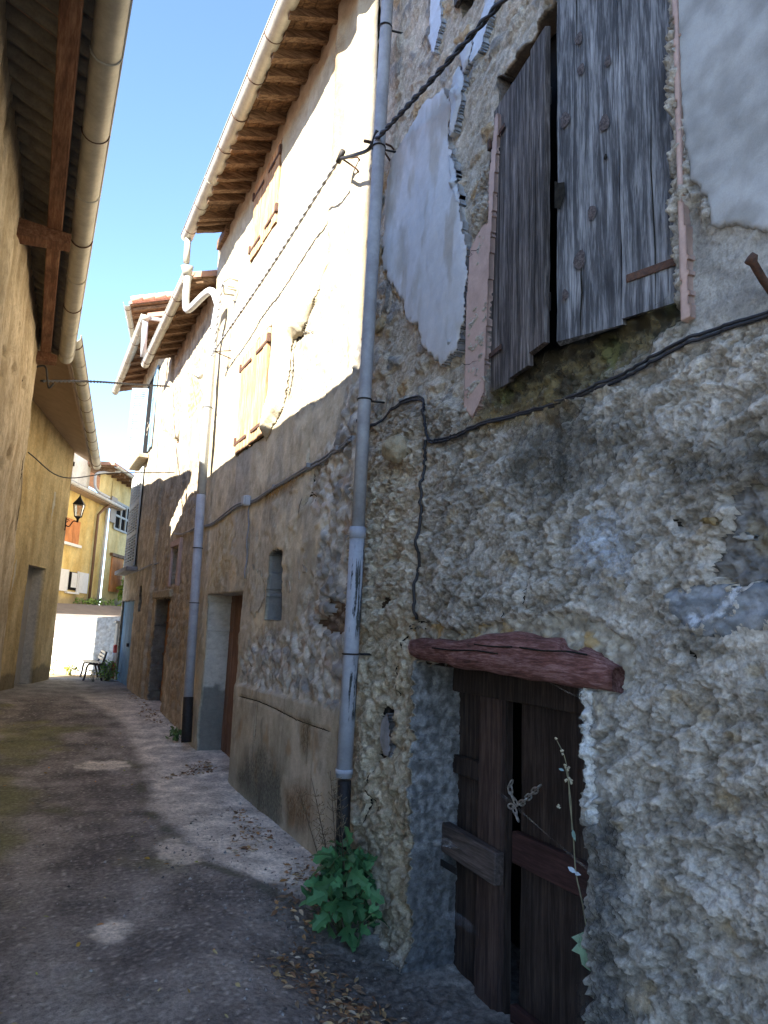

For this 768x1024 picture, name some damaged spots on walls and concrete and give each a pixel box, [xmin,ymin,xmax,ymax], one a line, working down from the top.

peeling [382,0,500,367]
peeling [679,0,768,232]
crack [239,696,328,734]